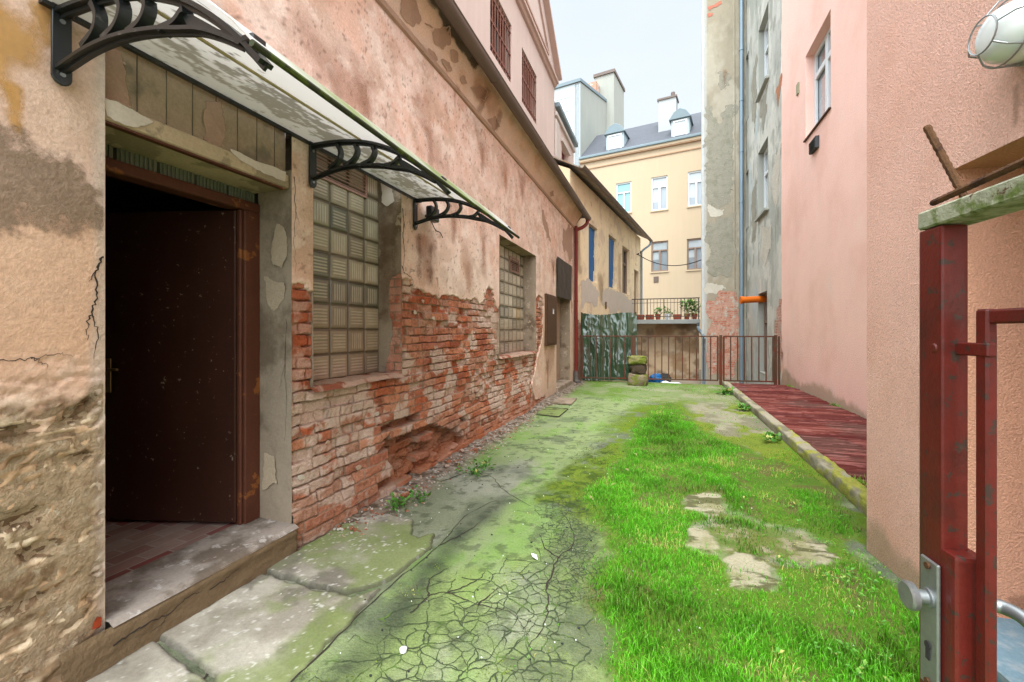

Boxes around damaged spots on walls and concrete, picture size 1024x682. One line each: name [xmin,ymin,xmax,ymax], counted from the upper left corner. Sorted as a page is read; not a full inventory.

peeling [400,0,488,101]
spalling [718,71,732,90]
spalling [751,54,782,133]
peeling [271,224,288,268]
spalling [702,104,739,380]
crack [0,256,104,368]
spalling [262,274,545,549]
spalling [0,384,103,682]
crack [290,469,608,682]